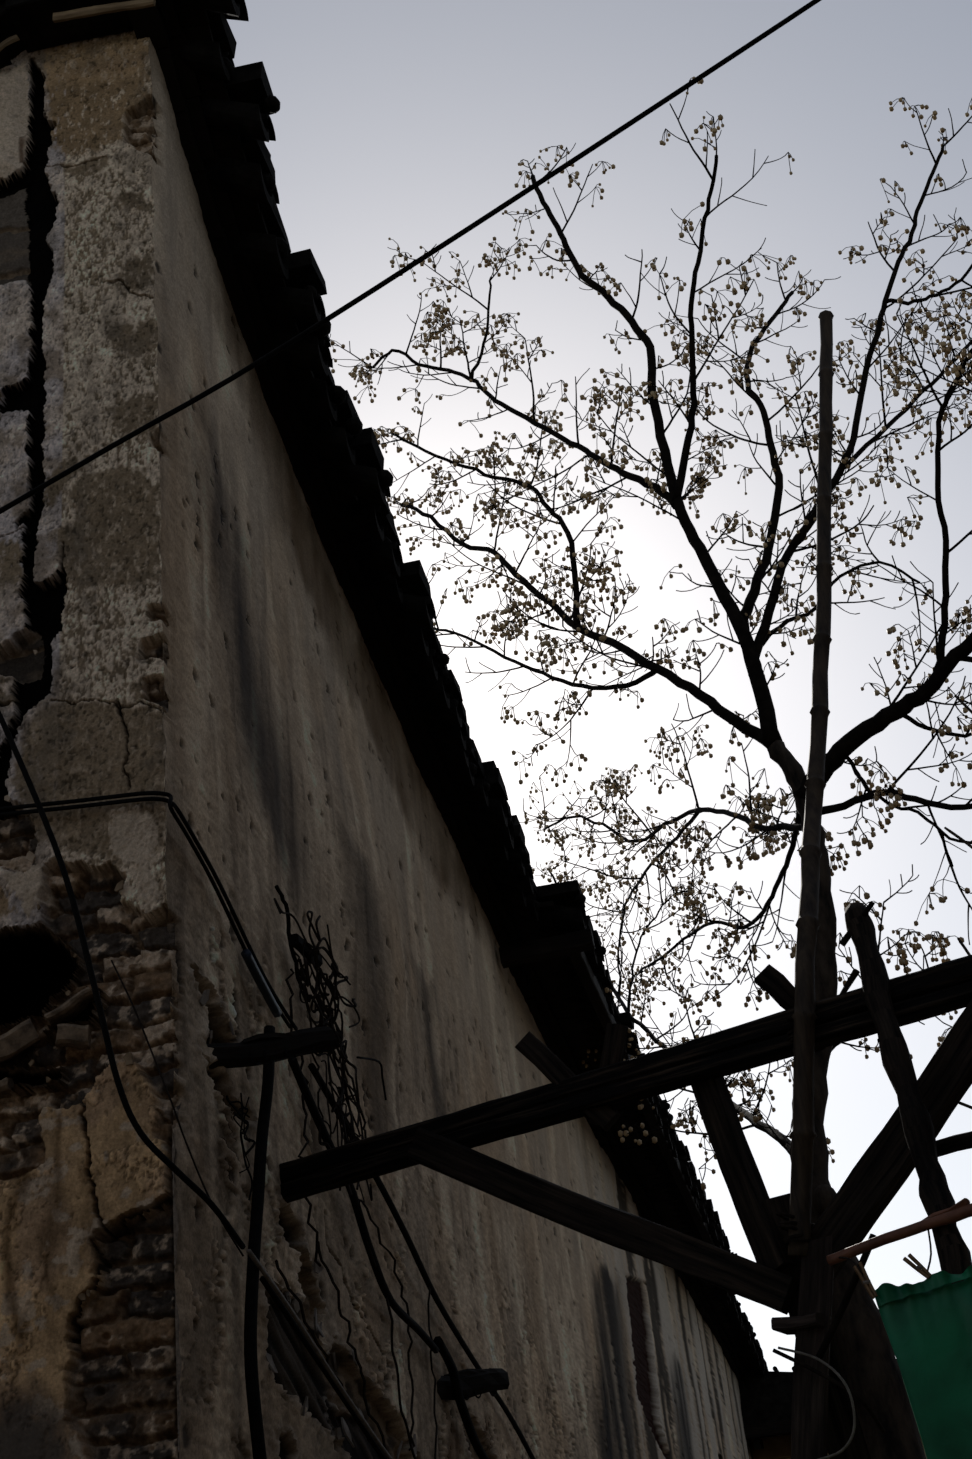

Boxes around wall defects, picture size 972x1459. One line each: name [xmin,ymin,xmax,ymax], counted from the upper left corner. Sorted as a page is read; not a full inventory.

spalling [0,188,32,286]
crack [104,278,154,299]
crack [0,56,108,821]
spalling [0,795,181,1181]
spalling [63,1199,182,1459]
water stain [596,1267,635,1459]
water stain [674,1363,693,1459]